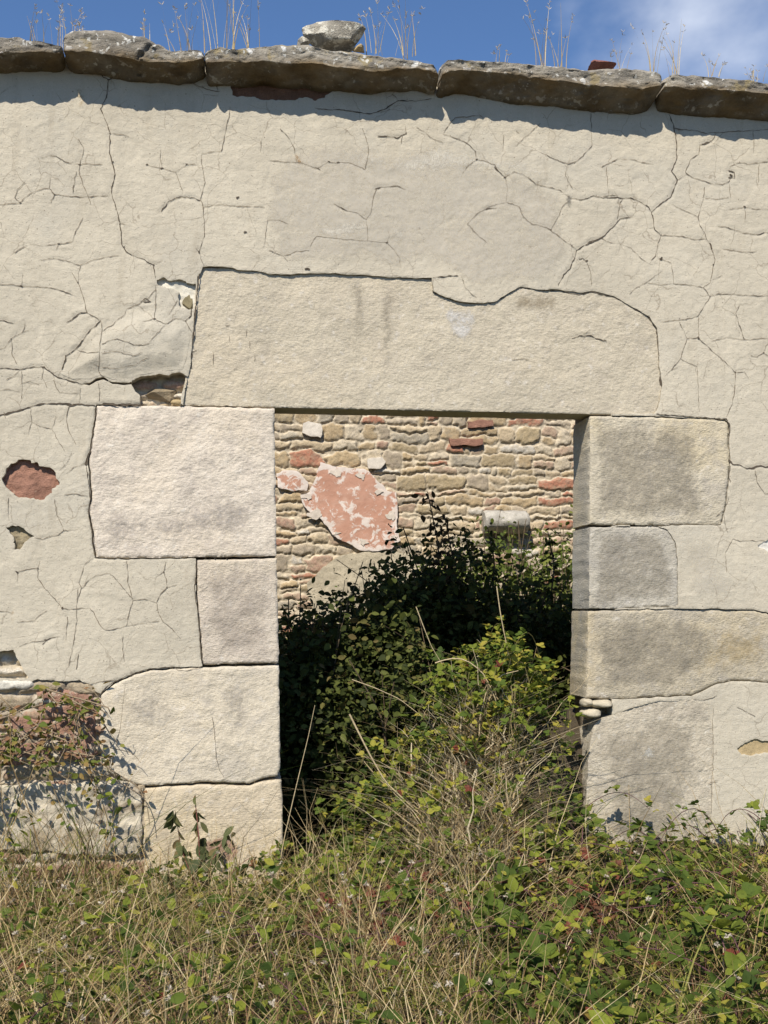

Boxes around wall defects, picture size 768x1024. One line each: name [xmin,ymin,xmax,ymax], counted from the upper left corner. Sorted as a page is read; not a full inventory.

spalling [157,279,196,310]
spalling [132,375,185,407]
crack [0,75,768,693]
spalling [3,460,60,500]
flaking render [276,462,400,552]
spalling [7,526,34,549]
spalling [737,739,768,756]
spalling [0,650,146,907]